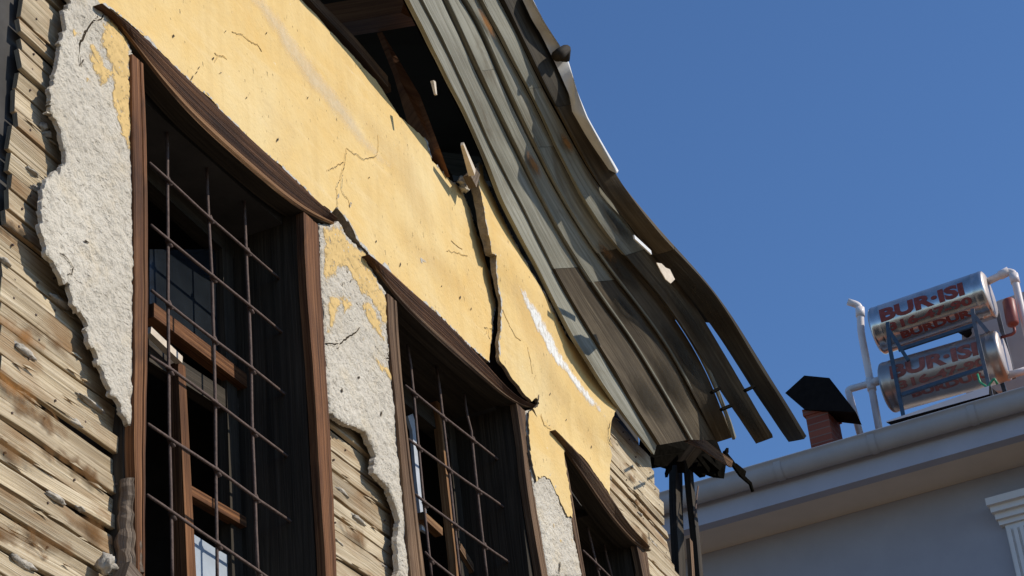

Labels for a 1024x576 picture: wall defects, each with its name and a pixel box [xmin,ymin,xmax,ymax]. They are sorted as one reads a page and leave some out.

spalling [35,0,161,427]
crack [327,135,379,208]
spalling [317,193,409,576]
crack [484,311,533,374]
spalling [525,395,581,576]